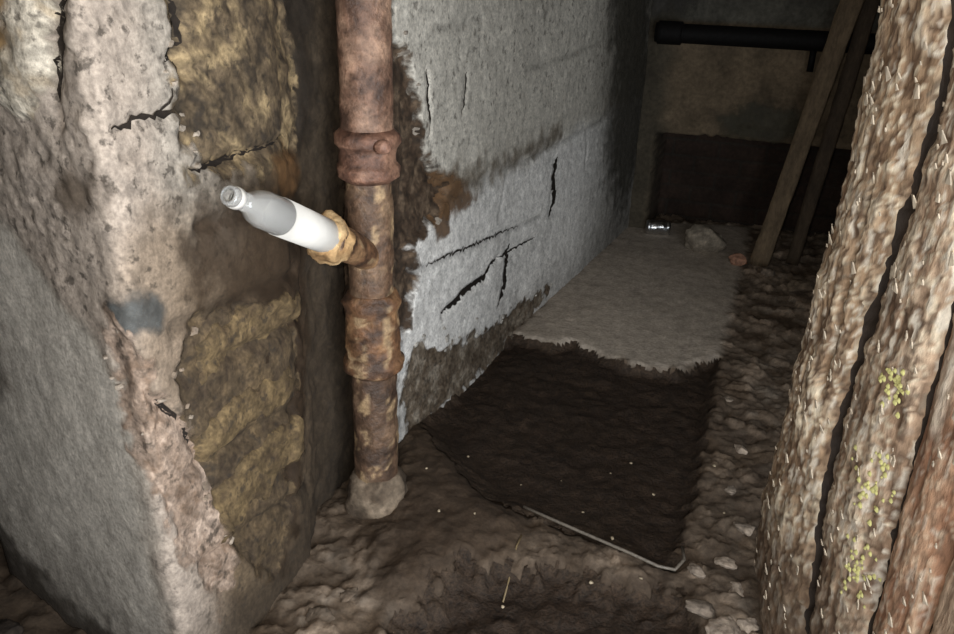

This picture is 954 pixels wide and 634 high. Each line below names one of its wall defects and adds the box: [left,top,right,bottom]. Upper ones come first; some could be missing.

crack [53,0,67,122]
crack [111,0,182,131]
flaking render [163,0,299,185]
flaking render [391,31,553,432]
crack [426,226,533,314]
crack [548,157,558,217]
flaking render [102,291,305,593]